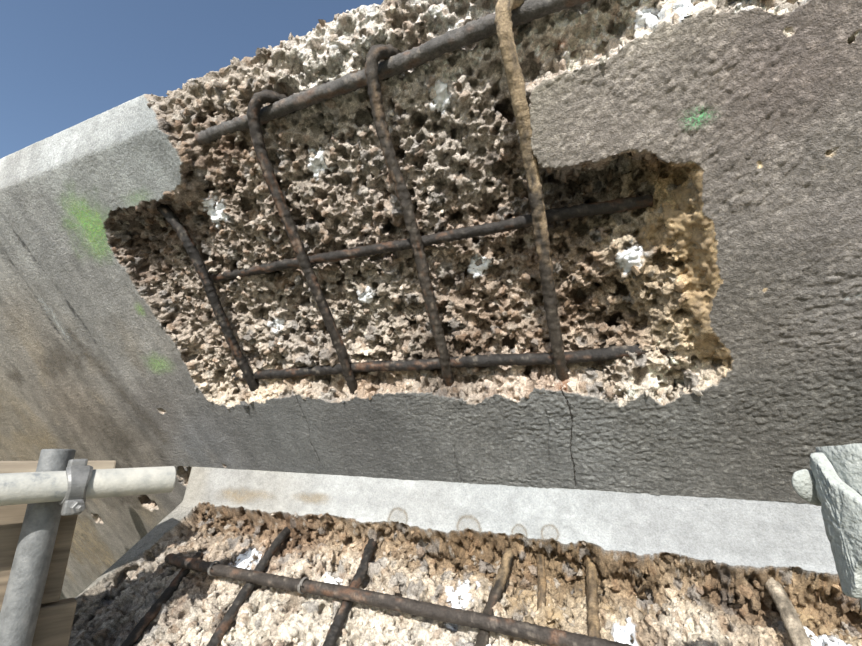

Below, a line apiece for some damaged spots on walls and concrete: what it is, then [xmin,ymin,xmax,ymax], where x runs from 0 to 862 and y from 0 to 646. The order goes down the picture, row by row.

spalling [512,0,810,117]
spalling [103,0,734,410]
rust [635,173,731,363]
crack [560,386,576,486]
spalling [68,502,862,646]
rust [798,614,838,639]